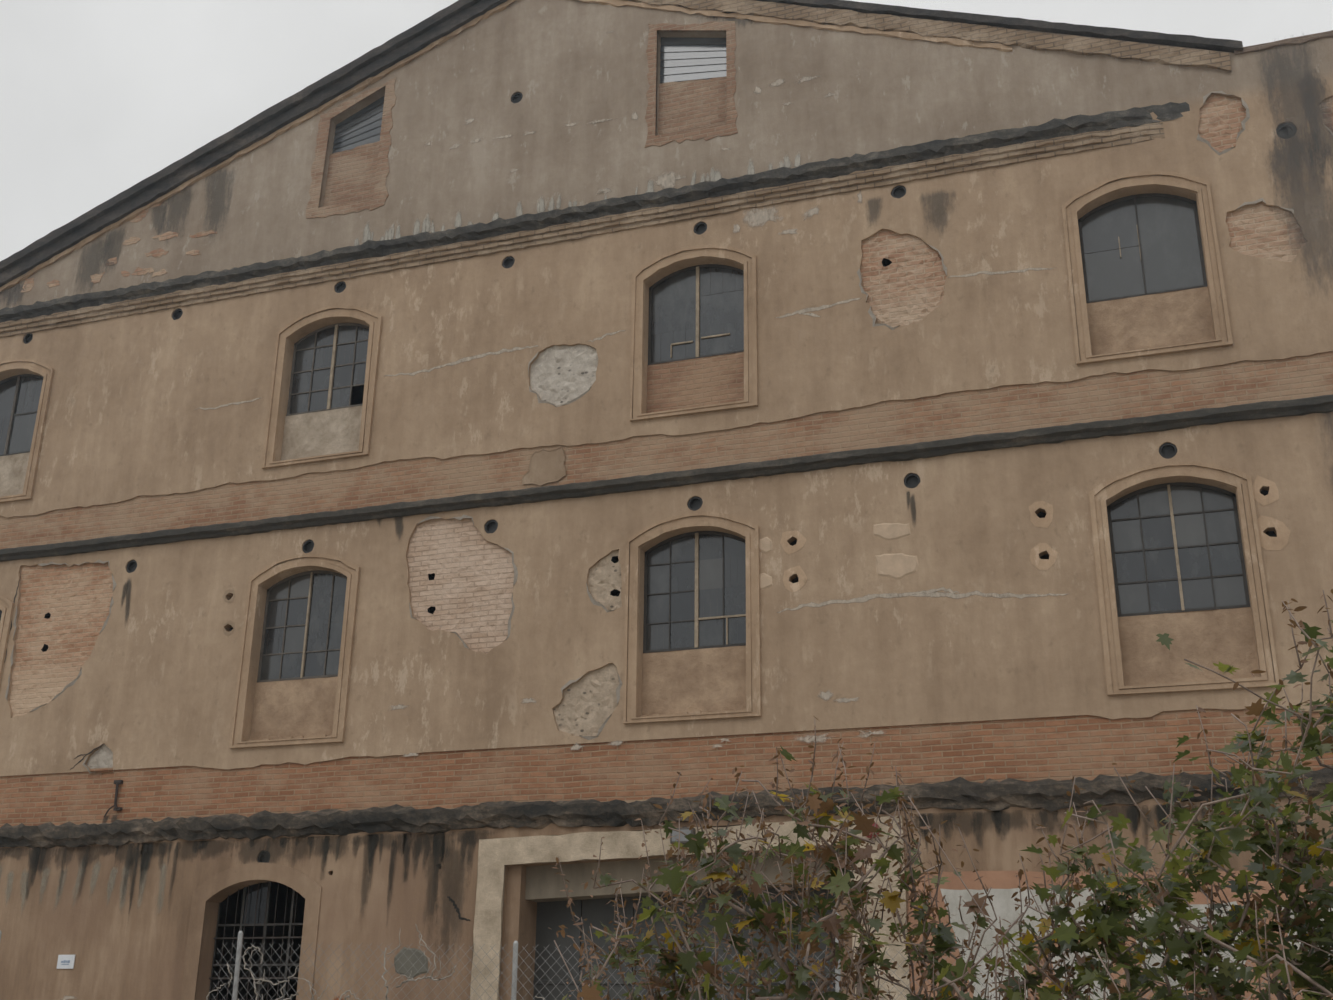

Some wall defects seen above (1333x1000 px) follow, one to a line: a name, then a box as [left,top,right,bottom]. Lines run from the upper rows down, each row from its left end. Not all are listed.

flaking render [857,230,947,330]
flaking render [528,345,598,407]
flaking render [407,514,518,654]
flaking render [586,550,622,612]
flaking render [5,560,117,717]
flaking render [554,663,623,750]
flaking render [797,734,828,743]